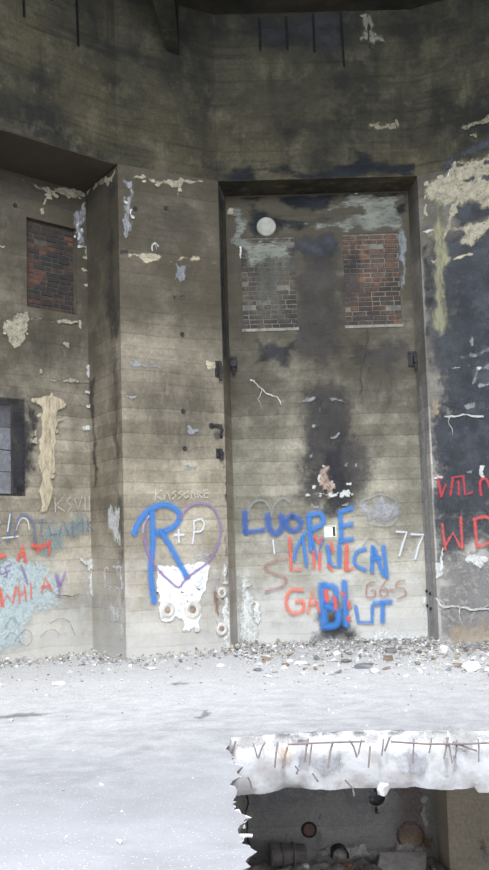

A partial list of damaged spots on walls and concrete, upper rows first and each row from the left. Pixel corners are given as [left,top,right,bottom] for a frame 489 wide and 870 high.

spalling [35,170,203,248]
damp [423,155,489,335]
peeling [3,312,41,348]
peeling [31,392,66,512]
crack [250,379,281,408]
spalling [306,465,353,509]
crack [445,414,484,434]
peeling [156,553,230,652]
spalling [226,730,489,841]
crack [245,795,256,859]